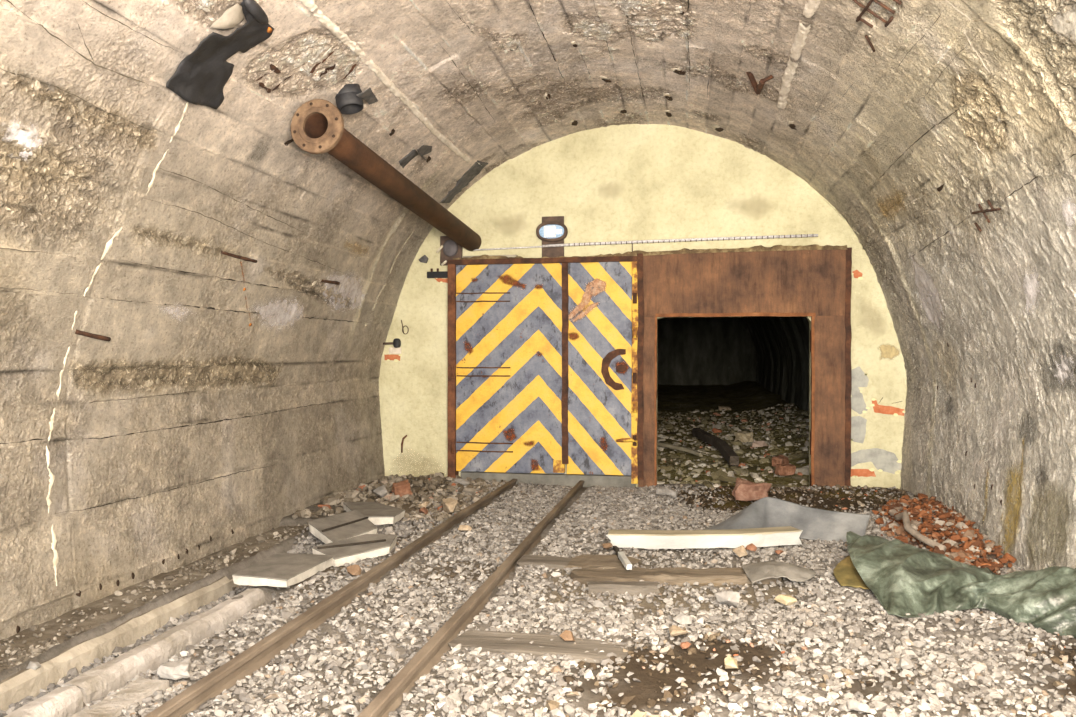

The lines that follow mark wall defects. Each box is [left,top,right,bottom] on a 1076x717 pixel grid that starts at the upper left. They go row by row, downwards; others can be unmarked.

spalling [852,0,902,54]
spalling [241,31,365,104]
peeling [972,18,1076,133]
spalling [34,80,142,138]
spalling [954,70,1013,147]
spalling [0,132,85,180]
crack [82,365,213,404]
crack [55,467,265,514]